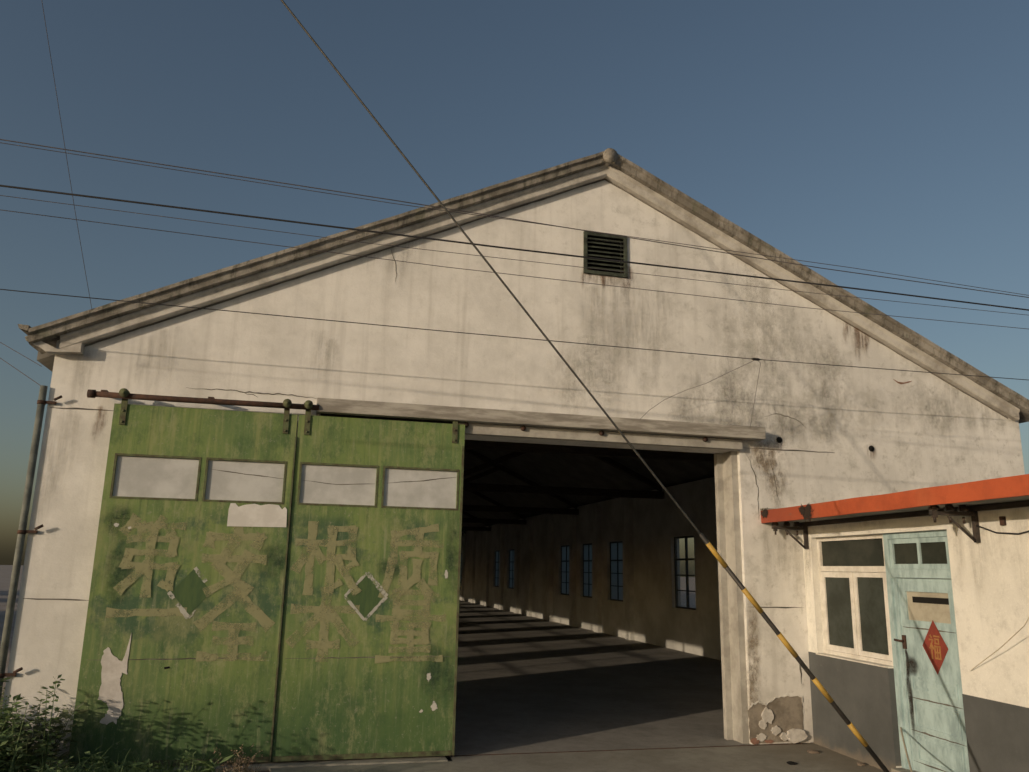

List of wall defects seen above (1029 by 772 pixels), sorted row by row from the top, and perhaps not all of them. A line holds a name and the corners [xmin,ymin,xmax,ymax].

crack [186,387,317,399]
crack [744,451,778,513]
spalling [748,694,808,745]